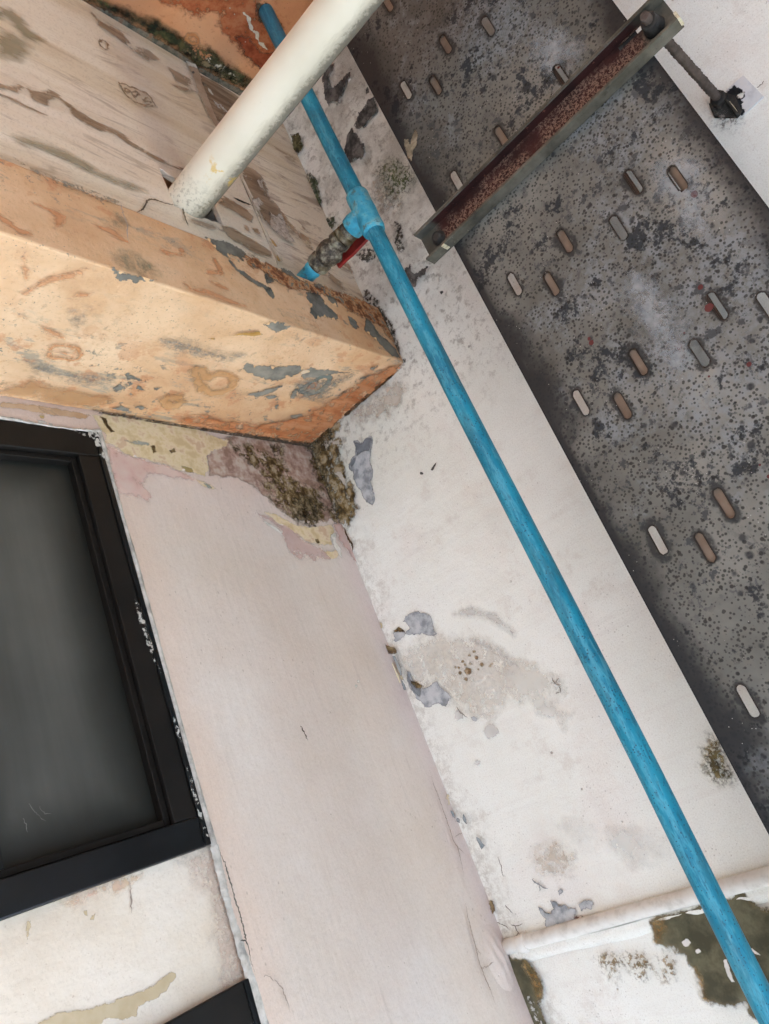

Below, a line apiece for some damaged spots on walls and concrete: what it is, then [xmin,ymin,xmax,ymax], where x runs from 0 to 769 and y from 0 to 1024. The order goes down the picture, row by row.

peeling [322,64,352,105]
peeling [344,87,377,163]
crack [121,198,188,242]
flaking render [205,237,400,358]
peeling [241,363,378,409]
peeling [92,405,228,490]
leakage [0,382,358,527]
peeling [349,436,375,505]
leakage [700,739,732,784]
leakage [509,958,546,1024]
leakage [600,905,757,1020]
leakage [726,893,769,983]